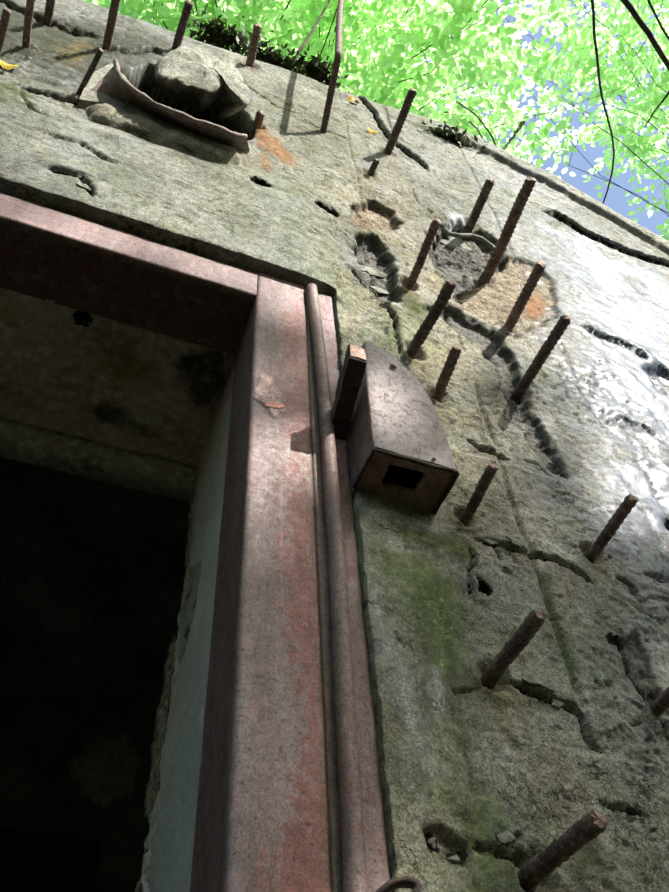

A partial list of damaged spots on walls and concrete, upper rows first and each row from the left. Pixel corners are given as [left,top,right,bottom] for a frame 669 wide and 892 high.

crack [358,97,427,169]
crack [53,172,91,195]
crack [543,211,669,268]
spalling [351,177,571,478]
peeling [254,374,287,416]
crack [468,536,576,599]
spalling [145,569,201,816]
efflorescence [398,686,423,748]
crack [520,673,583,730]
spalling [424,830,468,864]
crack [496,830,522,867]